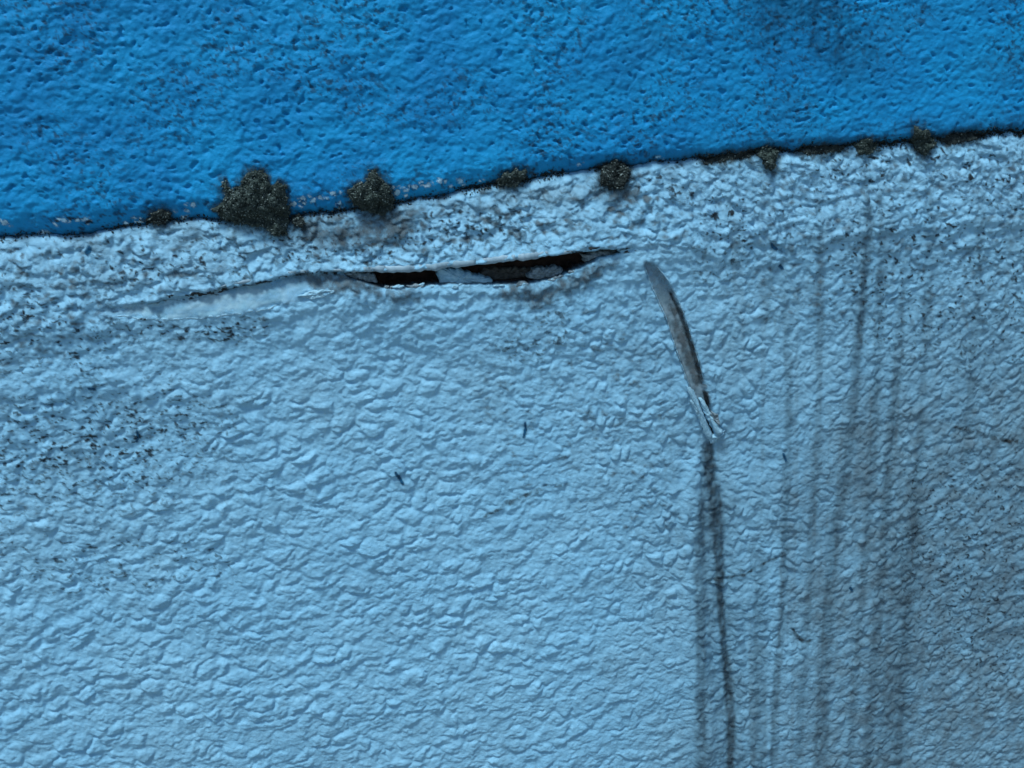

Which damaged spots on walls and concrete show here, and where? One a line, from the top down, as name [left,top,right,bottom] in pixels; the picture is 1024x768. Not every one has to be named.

leakage [272,233,337,263]
crack [141,246,636,303]
leakage [351,196,524,265]
leakage [638,166,766,276]
leakage [816,145,1024,357]
spalling [645,263,725,444]
leakage [705,444,735,768]